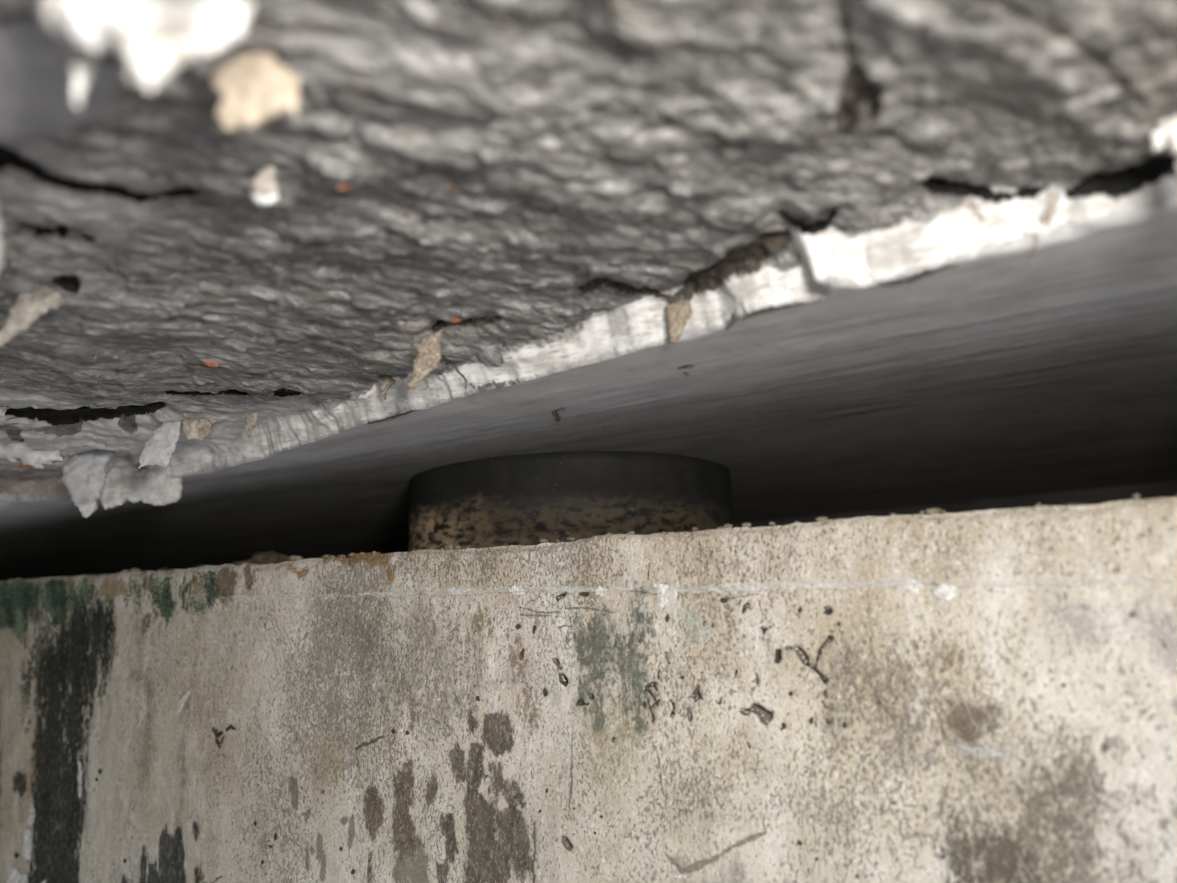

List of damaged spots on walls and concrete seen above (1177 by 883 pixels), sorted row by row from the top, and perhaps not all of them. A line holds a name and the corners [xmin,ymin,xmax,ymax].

crack [833,0,883,141]
crack [985,0,1156,106]
spalling [0,0,1177,518]
damp [0,589,115,883]
damp [121,821,204,883]
damp [288,777,310,820]
damp [305,834,326,882]
damp [341,710,534,883]